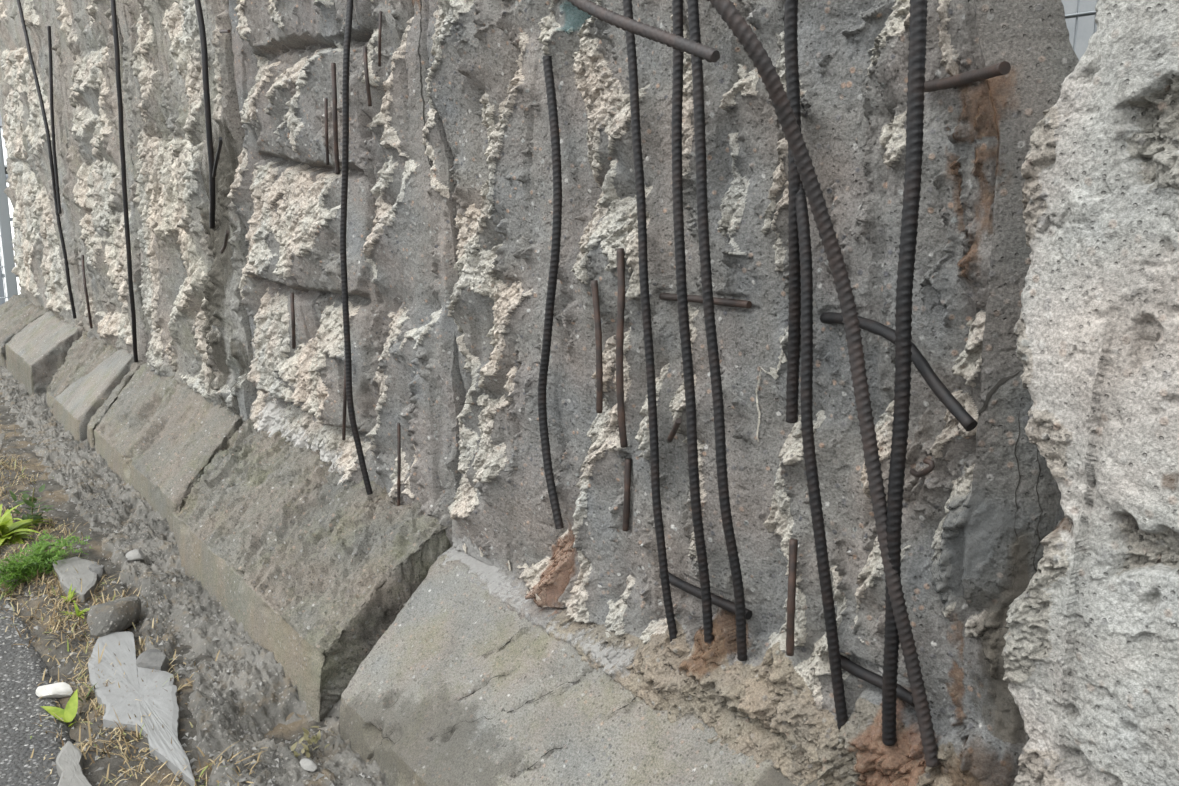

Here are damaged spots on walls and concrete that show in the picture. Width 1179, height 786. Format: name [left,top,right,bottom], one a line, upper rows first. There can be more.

spalling [867,0,910,77]
spalling [1,46,71,312]
spalling [56,0,249,411]
spalling [250,0,653,519]
spalling [682,52,695,179]
spalling [879,110,907,166]
corrosion [948,77,1005,225]
corrosion [680,611,748,673]
spalling [442,303,987,786]
spalling [990,528,1070,684]
spalling [1116,513,1179,575]
spalling [1013,746,1069,786]